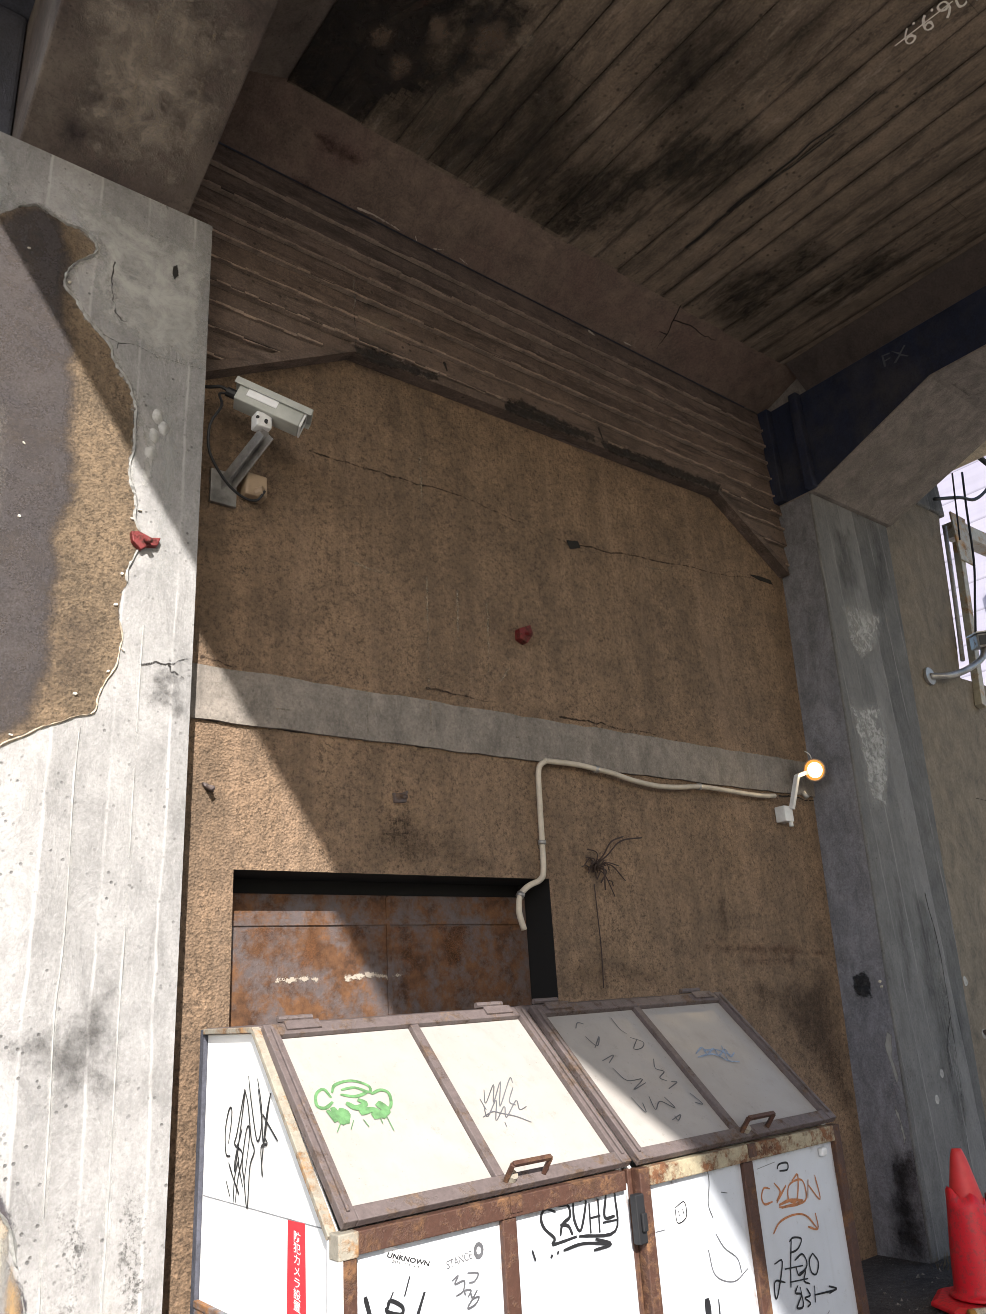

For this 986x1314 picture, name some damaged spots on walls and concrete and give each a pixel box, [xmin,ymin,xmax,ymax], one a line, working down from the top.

water stain [289,0,572,224]
spalling [0,203,155,747]
crack [309,450,772,584]
spalling [0,1198,26,1314]